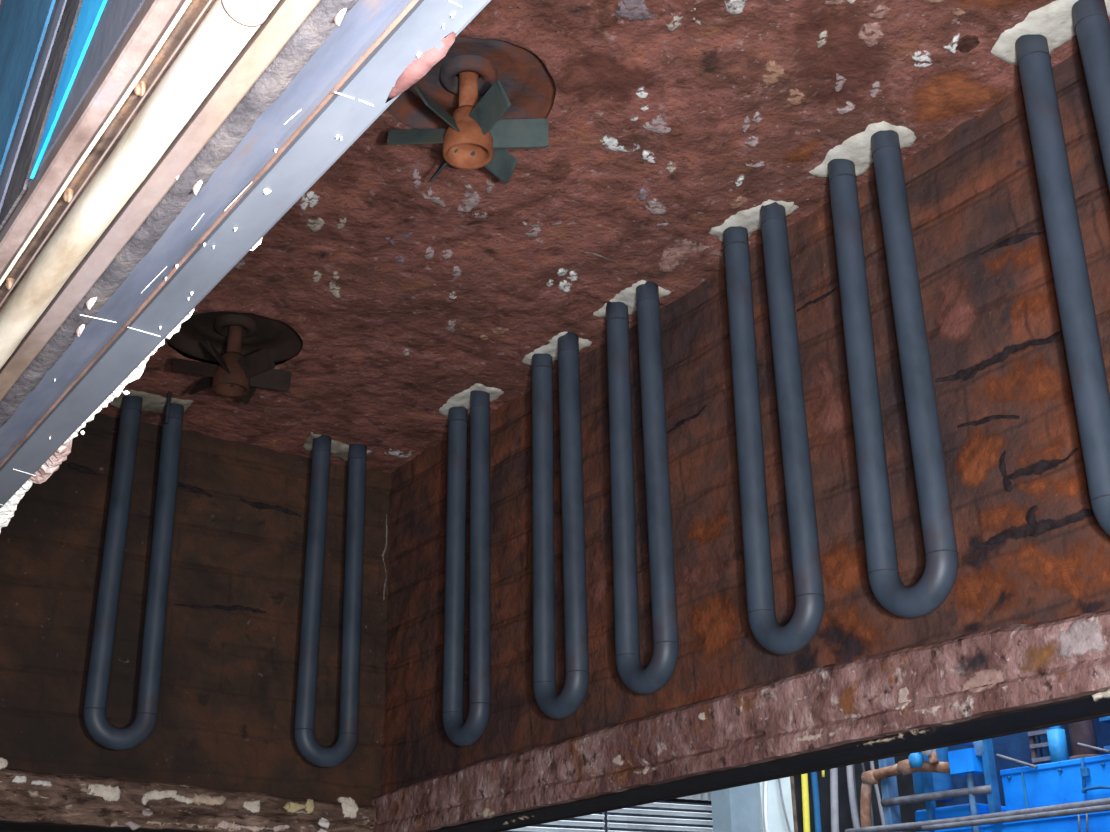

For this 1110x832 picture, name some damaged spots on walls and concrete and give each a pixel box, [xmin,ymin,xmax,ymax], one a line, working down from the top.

spalling [725,0,746,15]
spalling [630,87,671,134]
rust [913,70,997,123]
spalling [600,135,676,173]
crack [935,330,1062,382]
crack [957,415,1020,428]
rust [956,430,1003,486]
crack [978,448,1094,548]
spalling [0,757,52,786]
spalling [87,784,121,802]
spalling [125,790,330,832]
spalling [338,797,359,818]